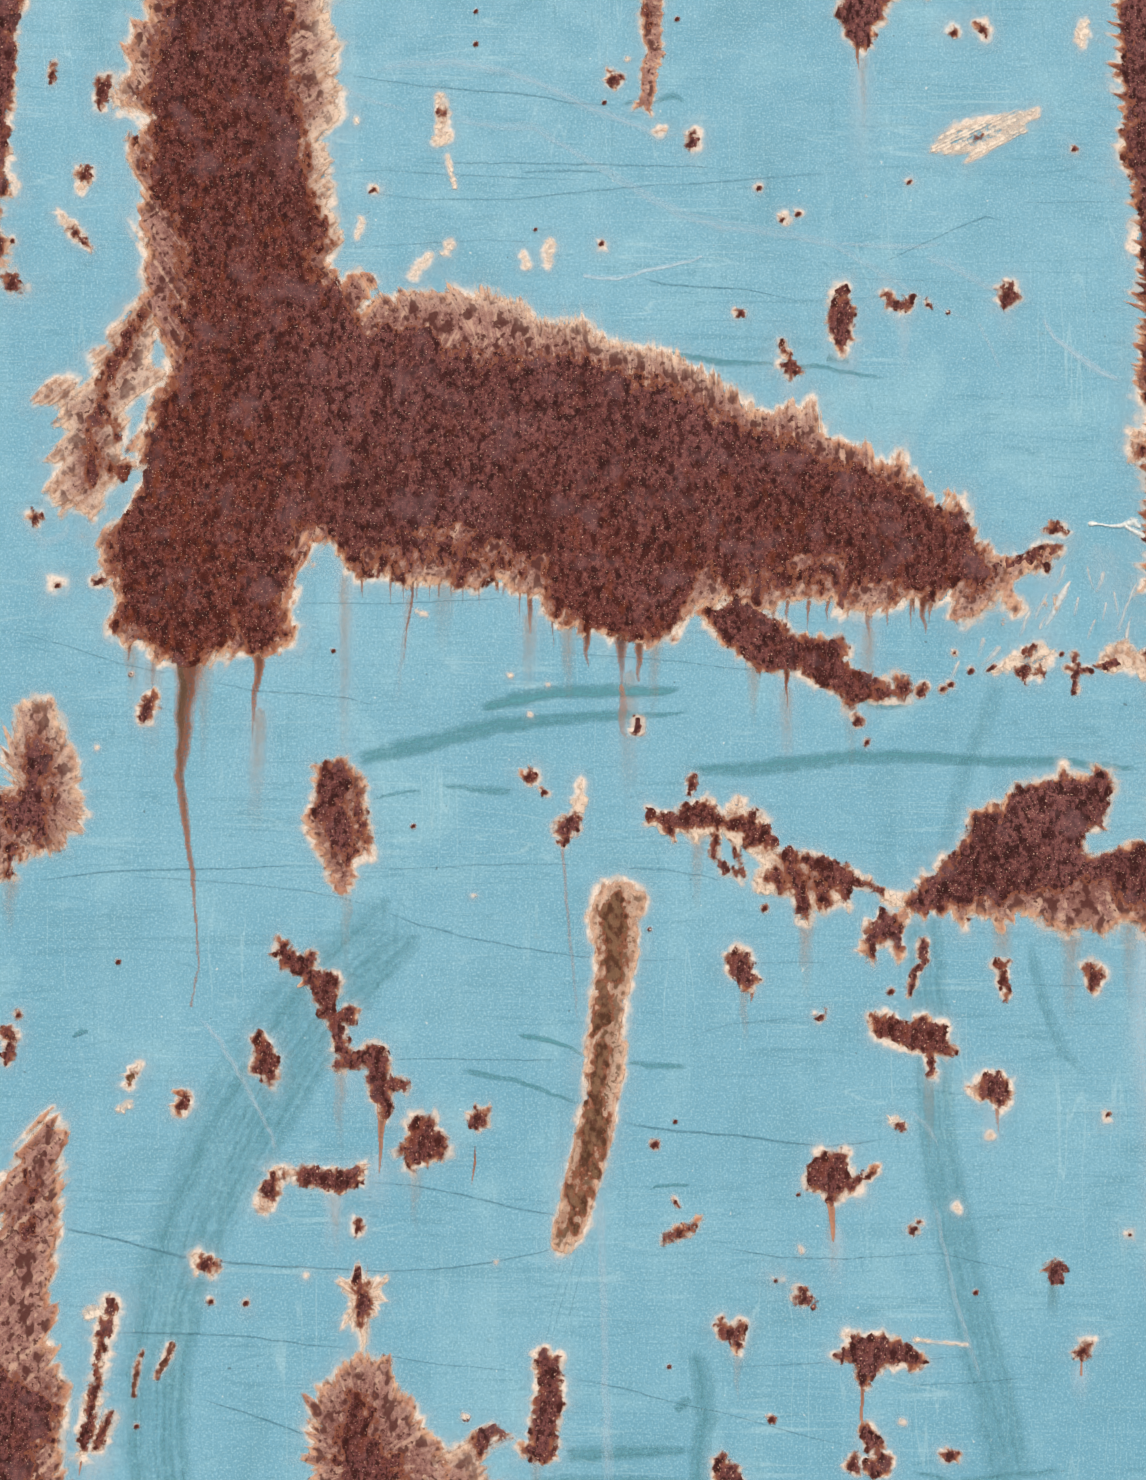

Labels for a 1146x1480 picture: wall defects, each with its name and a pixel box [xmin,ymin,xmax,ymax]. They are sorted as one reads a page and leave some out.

corrosion [0,0,31,294]
peeling [931,106,1041,164]
corrosion [1106,0,1146,595]
corrosion [23,0,1074,979]
corrosion [0,693,92,883]
corrosion [0,1104,139,1480]
corrosion [248,936,454,1239]
corrosion [300,1264,569,1480]
corrosion [551,875,652,1259]
corrosion [796,1144,883,1242]
corrosion [642,758,1146,1083]
corrosion [827,1325,969,1480]